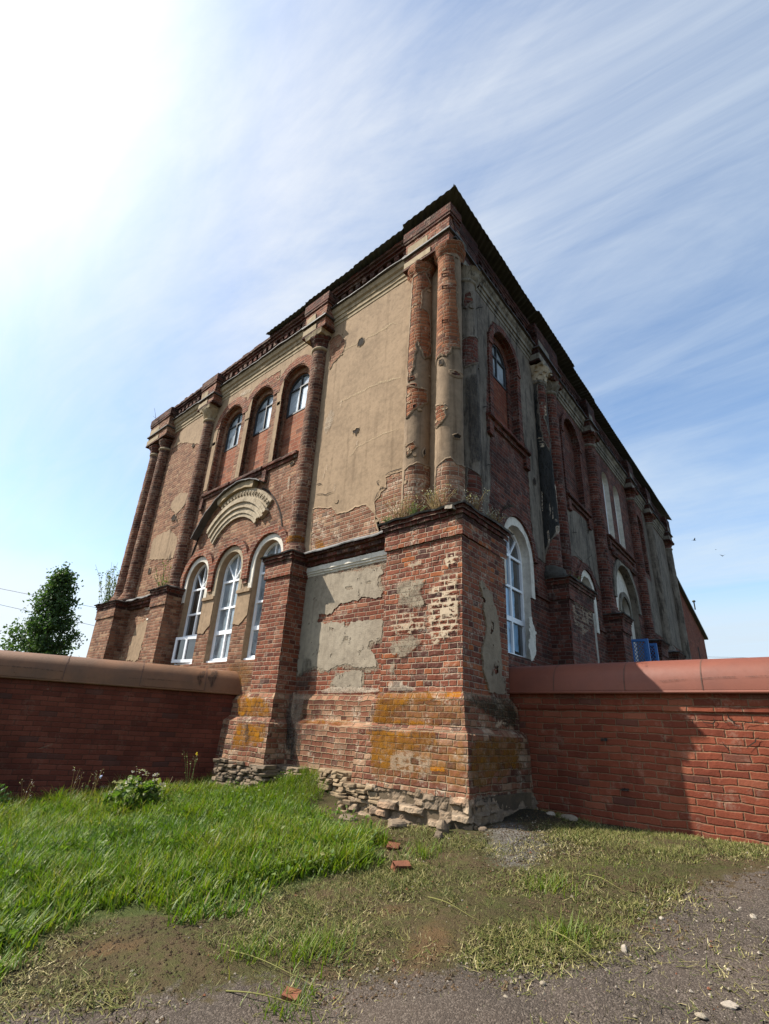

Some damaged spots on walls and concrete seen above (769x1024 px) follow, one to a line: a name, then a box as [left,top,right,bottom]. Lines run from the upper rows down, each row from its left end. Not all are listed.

spalling [405,253,479,429]
peeling [148,492,188,574]
spalling [310,441,483,551]
water stain [497,394,559,564]
peeling [296,562,424,690]
peeling [479,580,507,694]
water stain [391,753,430,773]